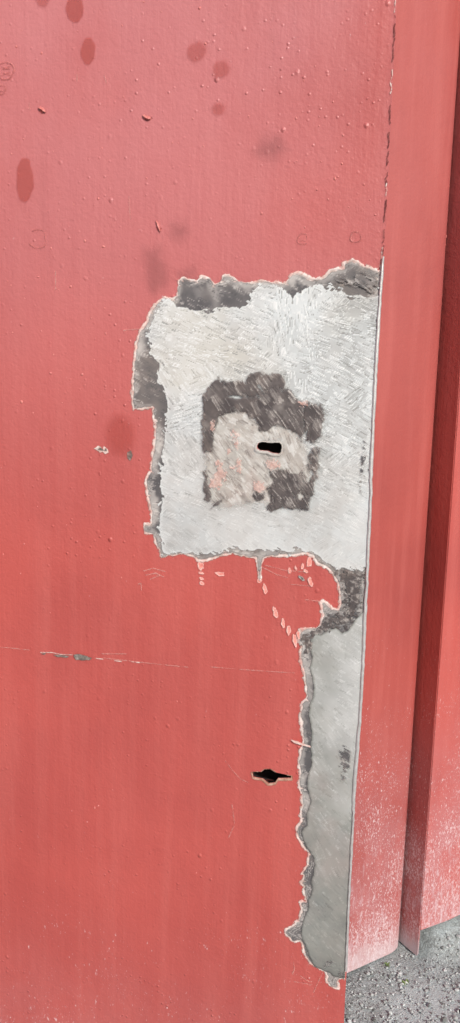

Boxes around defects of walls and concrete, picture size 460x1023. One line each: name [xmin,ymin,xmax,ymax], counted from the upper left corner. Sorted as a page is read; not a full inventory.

peeling [130,240,384,990]